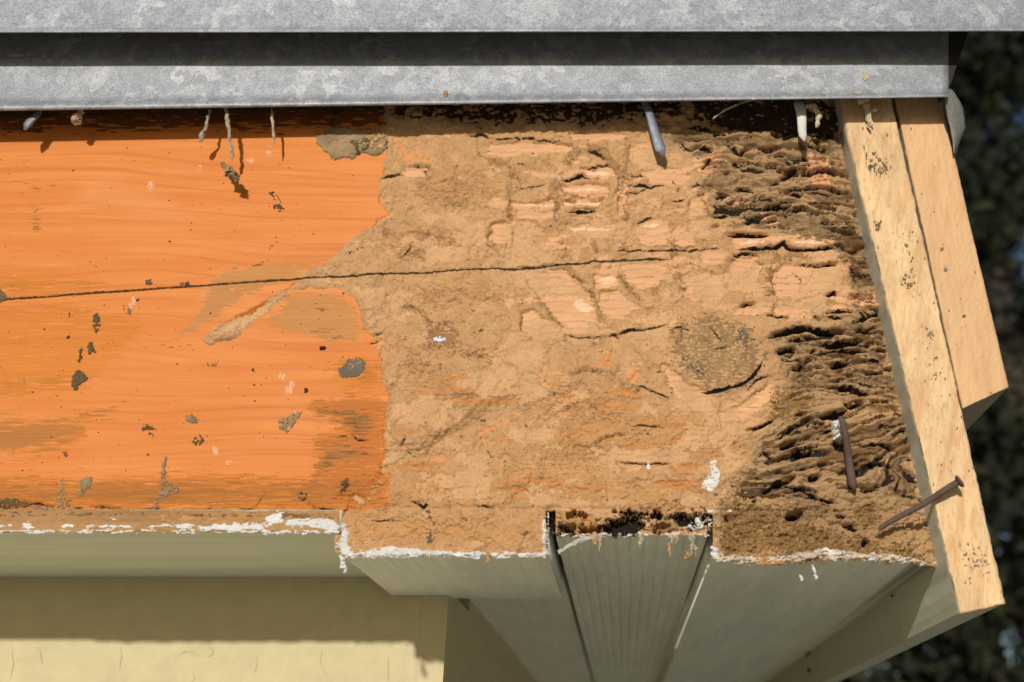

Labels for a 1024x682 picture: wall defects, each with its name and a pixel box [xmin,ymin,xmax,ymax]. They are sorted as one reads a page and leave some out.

peeling [401,168,429,180]
crack [2,124,921,547]
peeling [485,124,917,503]